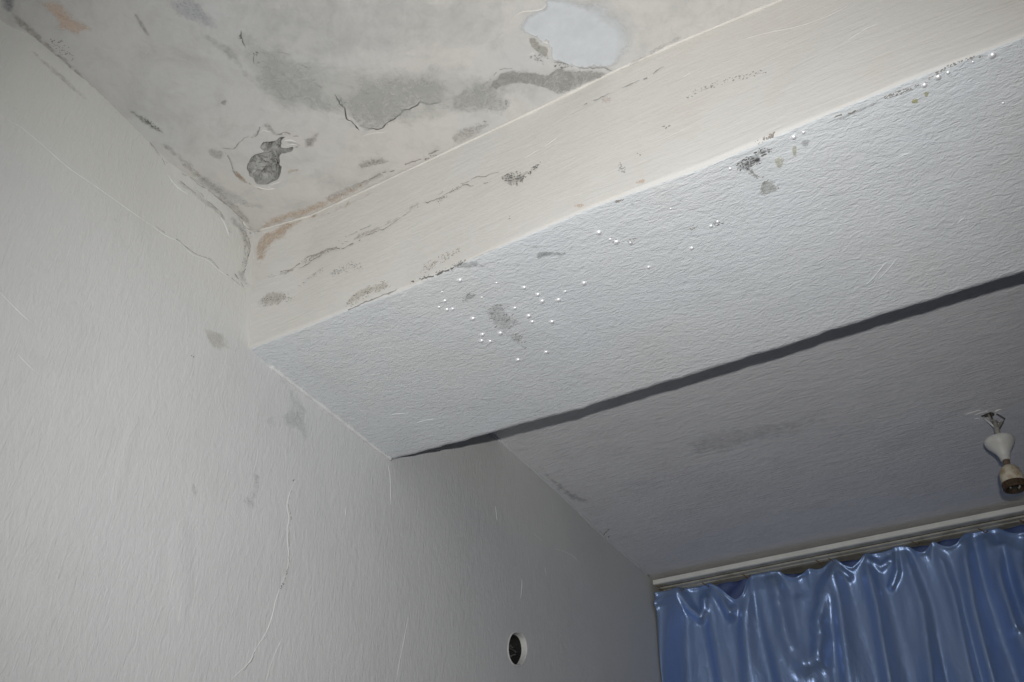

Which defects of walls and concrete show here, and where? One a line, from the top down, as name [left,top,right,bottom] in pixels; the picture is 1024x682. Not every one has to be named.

peeling [514,0,627,71]
crack [314,83,463,136]
damp [482,63,601,93]
flaking render [224,127,300,190]
damp [423,164,540,206]
damp [736,132,779,196]
damp [271,211,410,283]
crack [232,480,294,680]